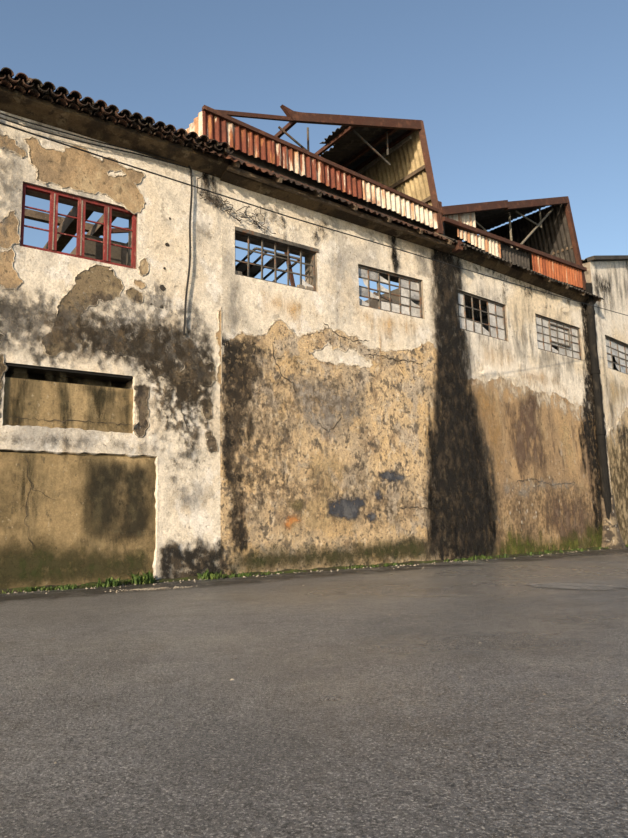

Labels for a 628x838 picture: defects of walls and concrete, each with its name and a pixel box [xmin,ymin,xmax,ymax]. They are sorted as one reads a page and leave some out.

flaking render [0,134,146,215]
flaking render [0,210,24,290]
flaking render [0,354,150,438]
spalling [0,448,159,580]
leakage [0,285,265,555]
leakage [159,537,235,579]
flaking render [40,257,477,575]
leakage [417,249,628,561]
flaking render [452,376,628,557]